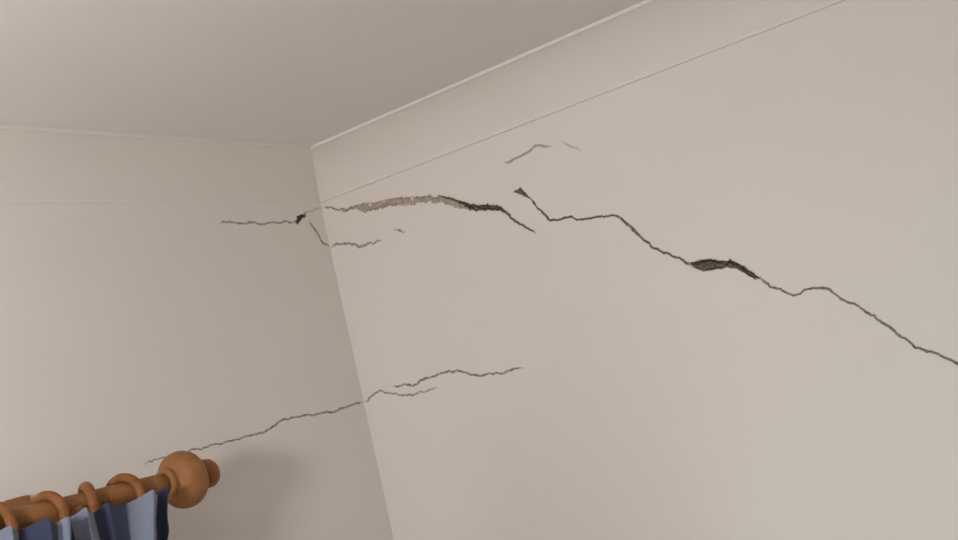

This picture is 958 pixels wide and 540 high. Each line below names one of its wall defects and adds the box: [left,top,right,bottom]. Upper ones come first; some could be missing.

crack [222,187,958,365]
crack [188,367,519,451]